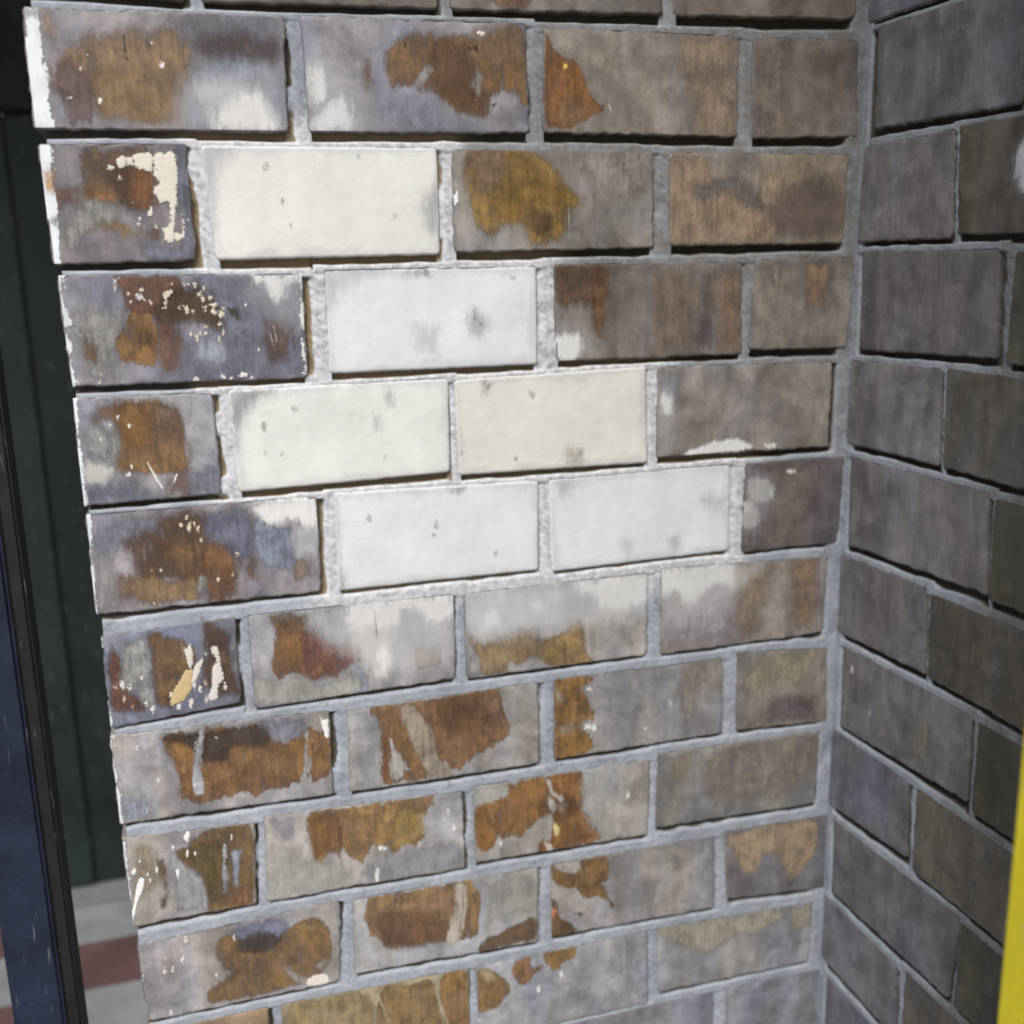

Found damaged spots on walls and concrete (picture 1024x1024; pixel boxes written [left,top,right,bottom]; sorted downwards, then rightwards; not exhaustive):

peeling [107,151,189,243]
peeling [126,282,226,342]
peeling [106,674,156,714]
peeling [169,644,227,710]
peeling [159,722,331,805]
peeling [370,688,511,786]
peeling [474,768,615,852]
peeling [267,794,538,952]
peeling [551,901,583,936]
peeling [551,856,614,909]